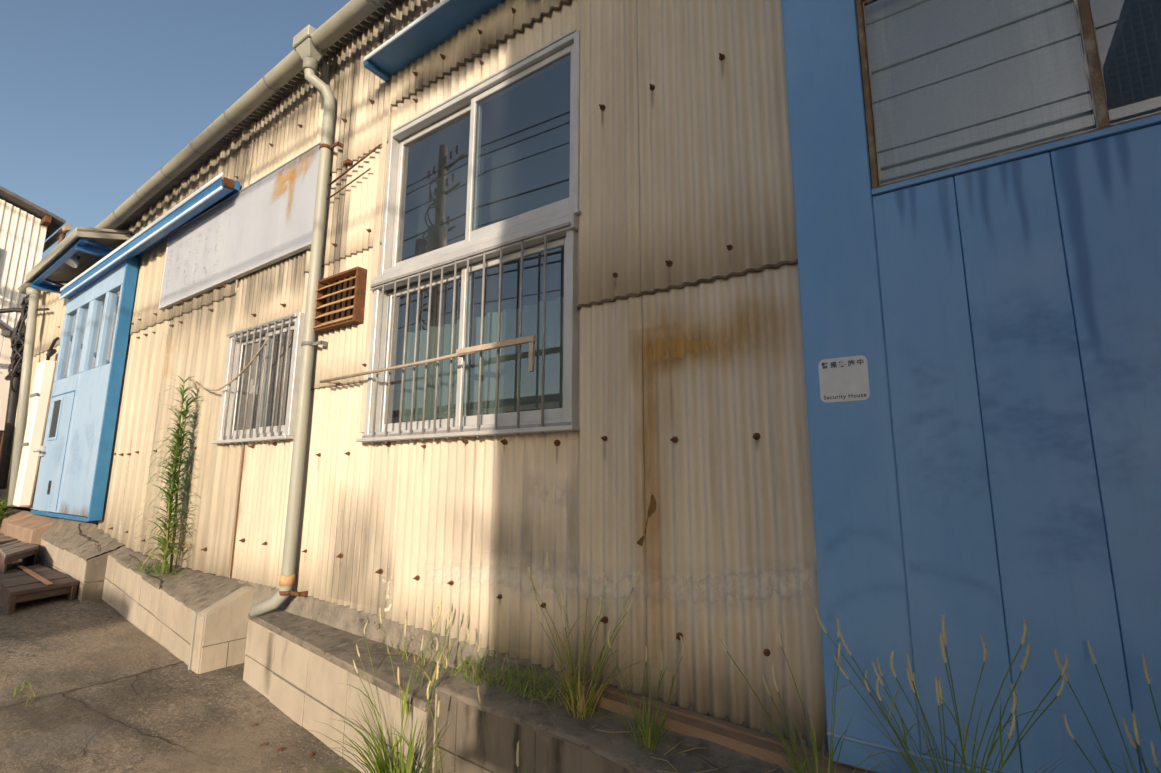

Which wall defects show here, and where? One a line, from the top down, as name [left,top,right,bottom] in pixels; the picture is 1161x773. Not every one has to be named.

crack [1,661,220,766]